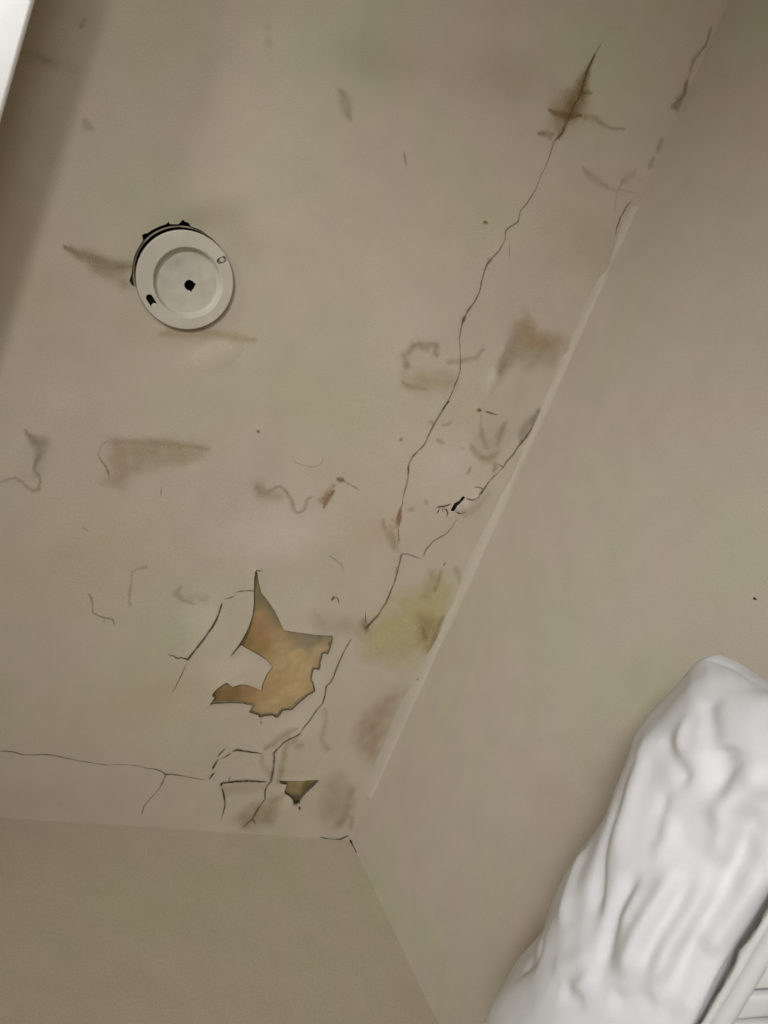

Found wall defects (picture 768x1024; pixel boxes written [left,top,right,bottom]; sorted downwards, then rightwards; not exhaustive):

crack [402,44,601,503]
crack [4,521,456,824]
peeling [210,570,333,718]
peeling [280,780,318,809]